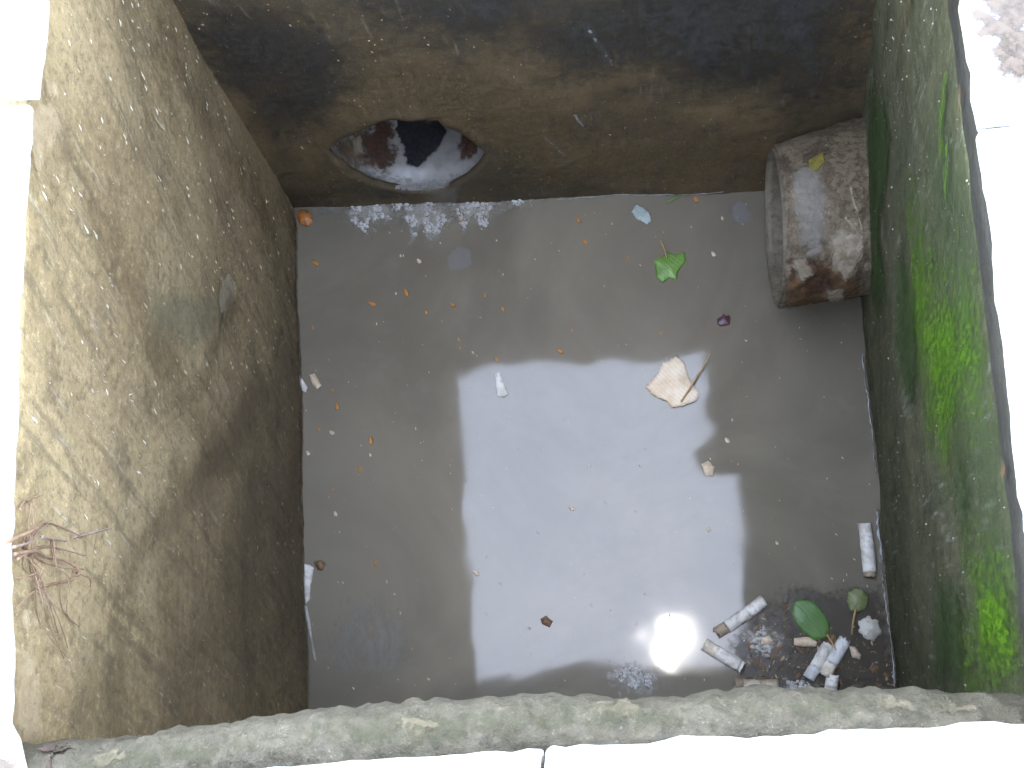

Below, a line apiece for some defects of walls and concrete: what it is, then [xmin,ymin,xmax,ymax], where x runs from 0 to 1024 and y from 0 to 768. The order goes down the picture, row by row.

corrosion [339,121,398,173]
corrosion [458,135,477,159]
corrosion [783,263,864,309]
water stain [876,509,895,686]